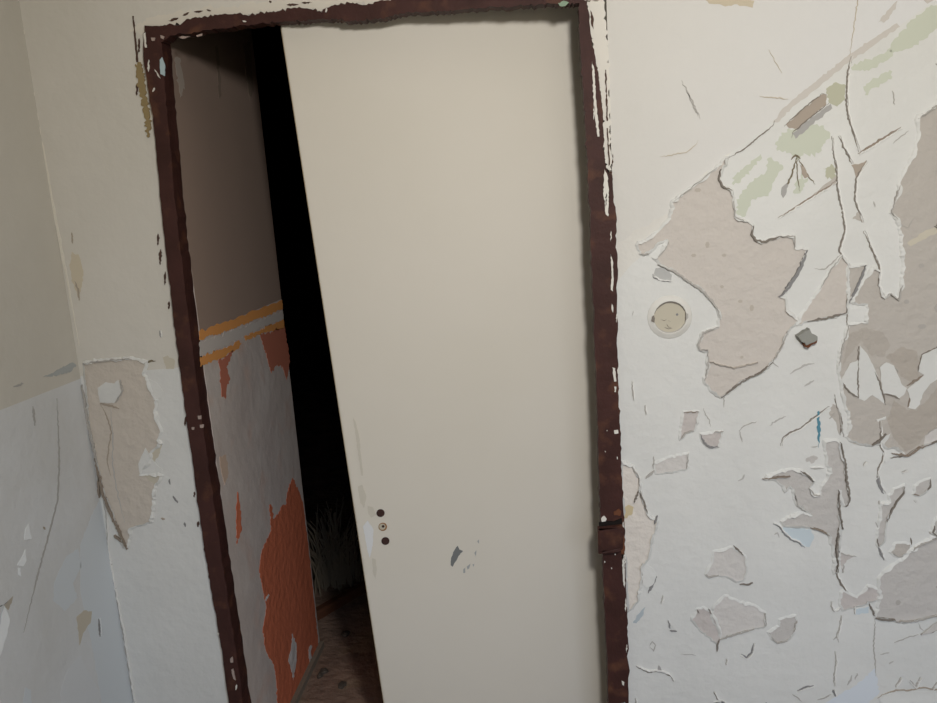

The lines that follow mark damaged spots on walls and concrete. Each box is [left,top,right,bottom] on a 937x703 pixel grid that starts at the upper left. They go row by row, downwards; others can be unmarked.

rust [135,62,152,138]
crack [732,0,908,323]
peeling [851,5,937,95]
peeling [199,310,290,399]
peeling [635,82,937,575]
crack [24,398,60,631]
peeling [76,356,164,703]
peeling [259,478,318,703]
peeling [621,452,690,623]
peeling [704,545,753,586]
peeling [690,594,799,651]
peeling [838,477,937,635]